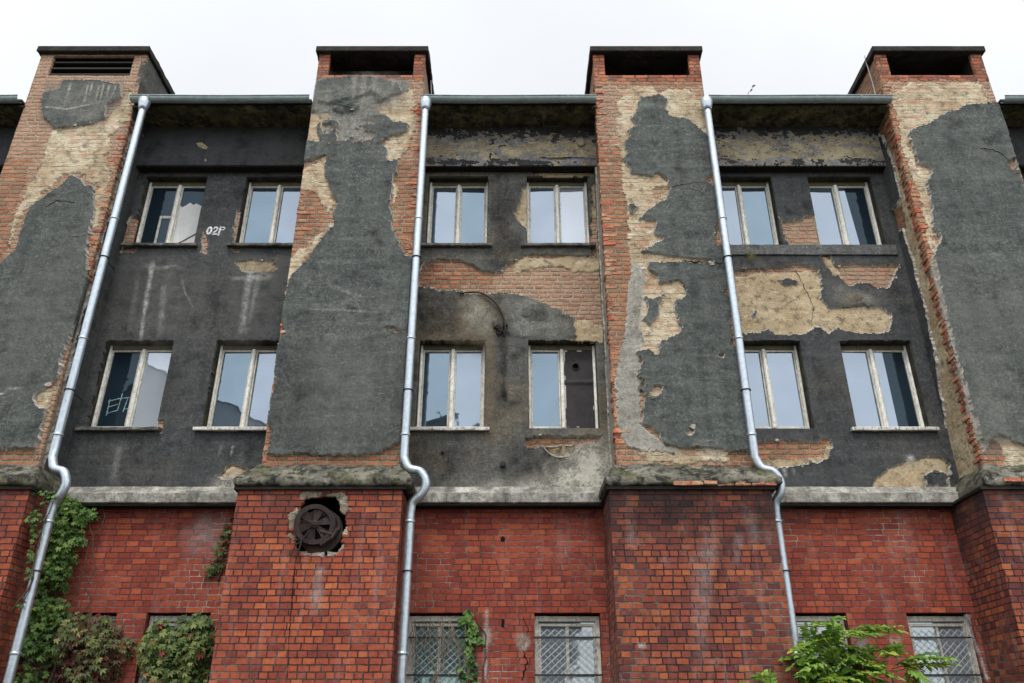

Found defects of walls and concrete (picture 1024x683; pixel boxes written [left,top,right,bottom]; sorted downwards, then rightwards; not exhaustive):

flaking render [0,55,149,469]
flaking render [230,110,338,302]
flaking render [262,363,401,466]
flaking render [368,60,1024,487]